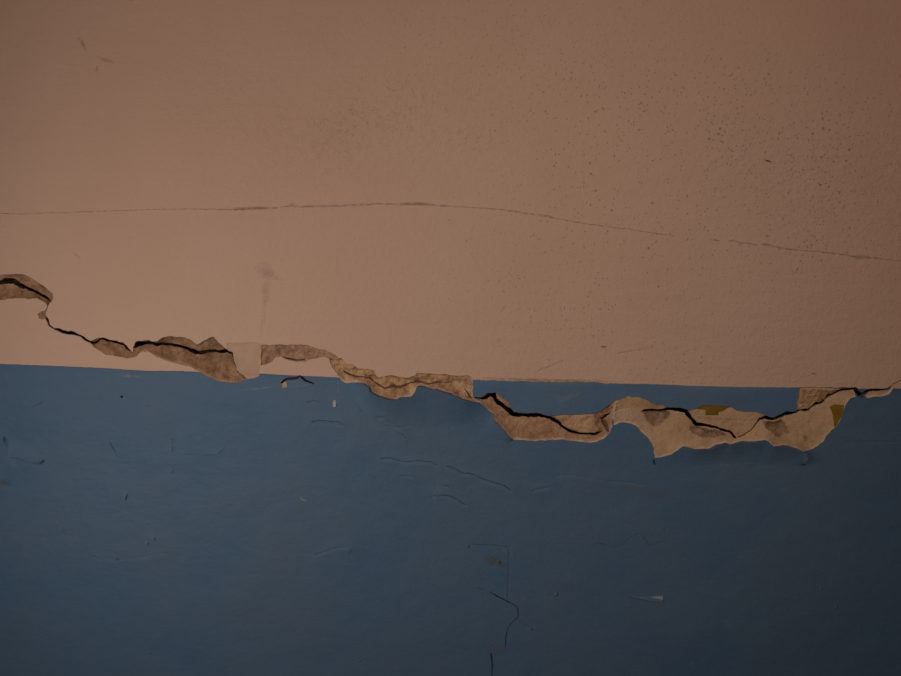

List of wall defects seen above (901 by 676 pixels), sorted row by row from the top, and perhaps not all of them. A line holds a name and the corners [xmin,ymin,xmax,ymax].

crack [0,203,673,236]
crack [710,239,899,261]
flaking render [0,274,53,320]
crack [0,278,238,372]
crack [343,370,610,435]
flaking render [93,336,893,466]
crack [641,380,900,439]
crack [476,544,529,674]